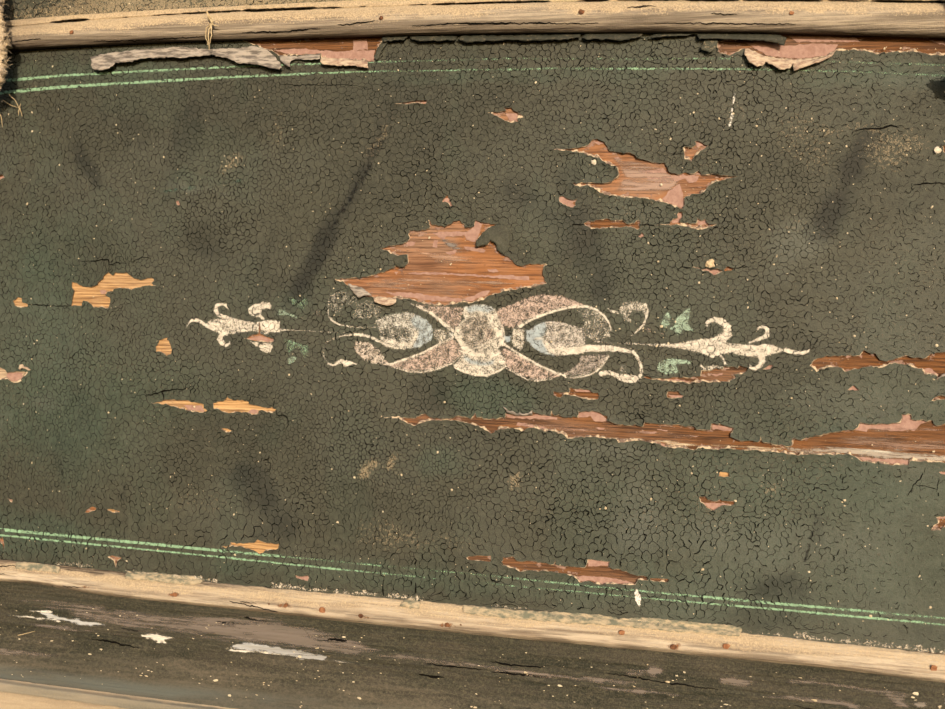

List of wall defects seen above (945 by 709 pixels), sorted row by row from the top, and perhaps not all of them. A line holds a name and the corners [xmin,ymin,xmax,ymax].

crack [126,38,249,49]
crack [3,0,375,26]
peeling [90,37,388,71]
crack [243,26,317,34]
crack [414,20,596,28]
crack [660,13,795,25]
peeling [701,34,945,71]
peeling [554,139,737,230]
peeling [335,220,547,306]
peeling [71,272,155,308]
crack [854,364,933,421]
peeling [381,388,945,474]